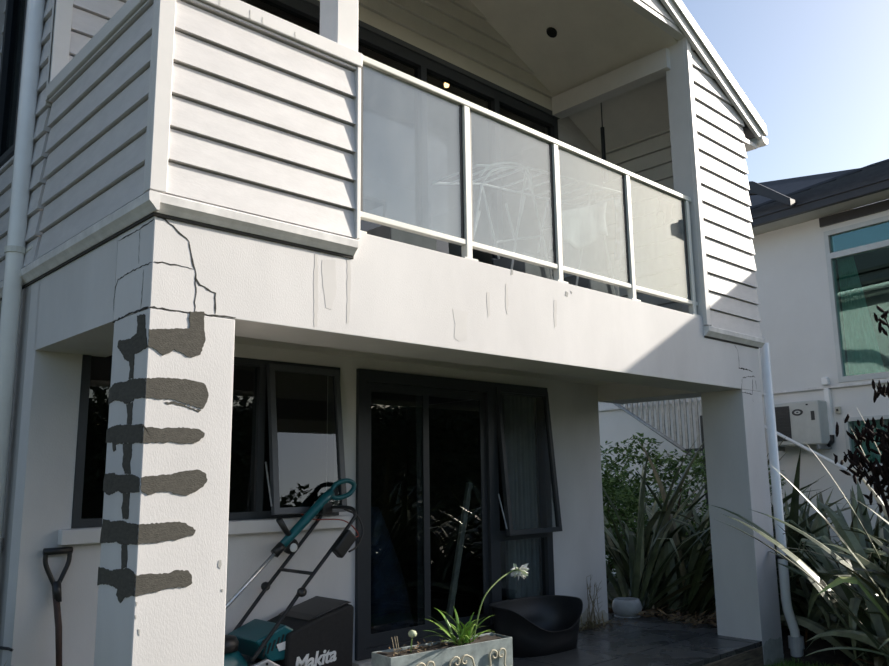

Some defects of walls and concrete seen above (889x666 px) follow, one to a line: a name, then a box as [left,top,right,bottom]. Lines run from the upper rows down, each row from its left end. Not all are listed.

crack [112,217,236,323]
crack [735,346,756,395]